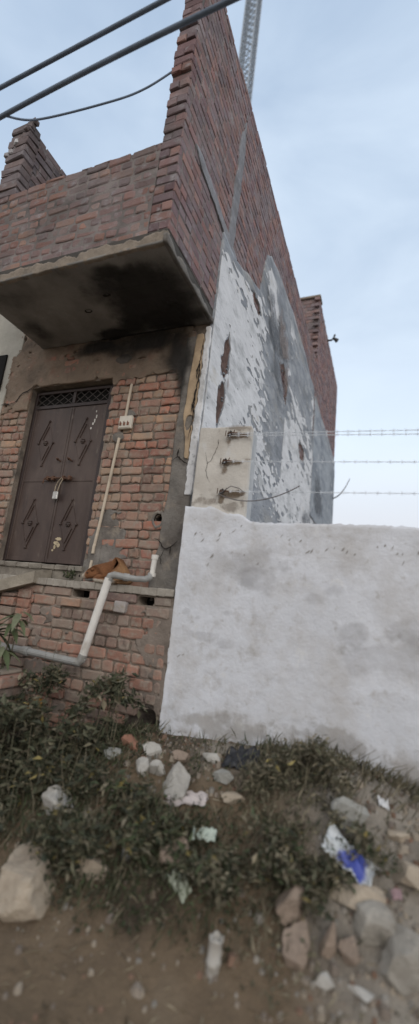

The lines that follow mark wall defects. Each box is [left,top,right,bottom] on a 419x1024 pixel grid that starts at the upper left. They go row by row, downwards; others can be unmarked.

water stain [78,309,203,355]
peeling [183,249,315,524]